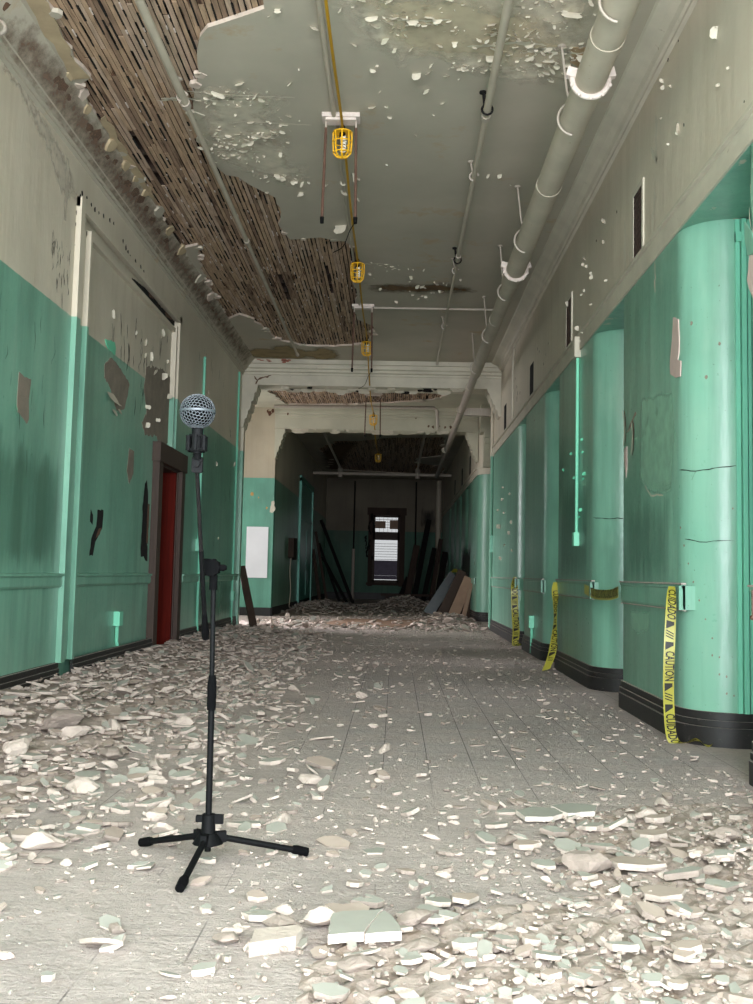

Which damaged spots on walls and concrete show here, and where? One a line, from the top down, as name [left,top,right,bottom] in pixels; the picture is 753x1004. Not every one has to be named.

peeling [338,0,596,83]
spalling [6,0,468,363]
peeling [744,162,753,297]
peeling [15,372,31,424]
peeling [104,339,129,416]
peeling [142,365,172,444]
spalling [267,386,465,416]
peeling [670,317,693,378]
spalling [290,425,452,474]